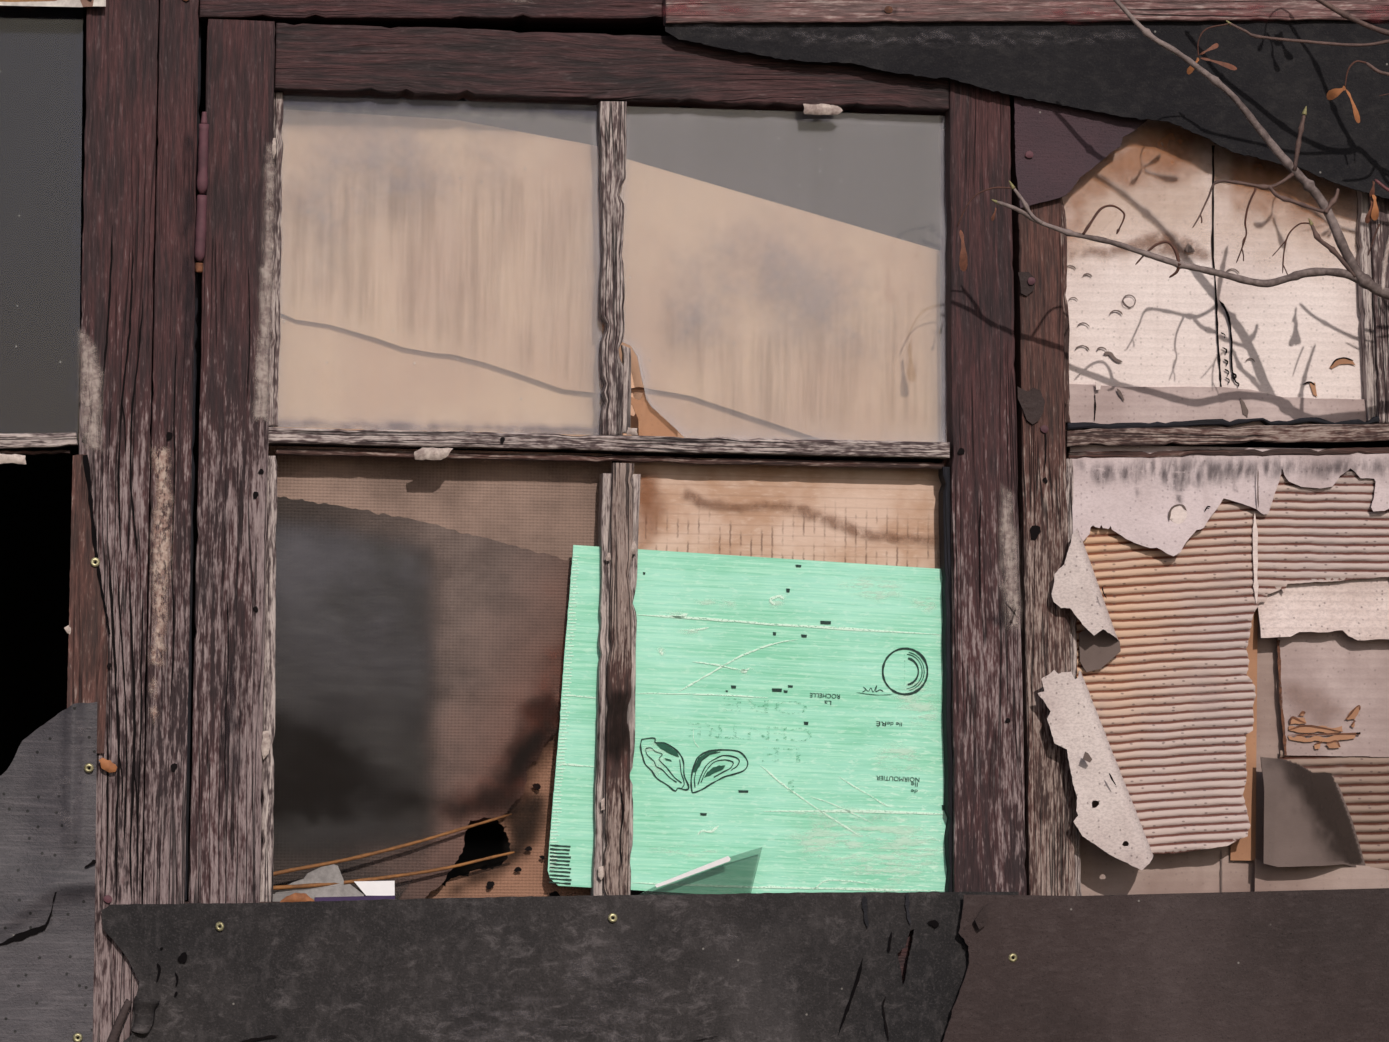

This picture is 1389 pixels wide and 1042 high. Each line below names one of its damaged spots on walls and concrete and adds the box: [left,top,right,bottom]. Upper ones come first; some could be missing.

water stain [1109,128,1201,174]
water stain [1232,154,1326,212]
peeling [1038,528,1153,870]
peeling [1288,705,1361,749]